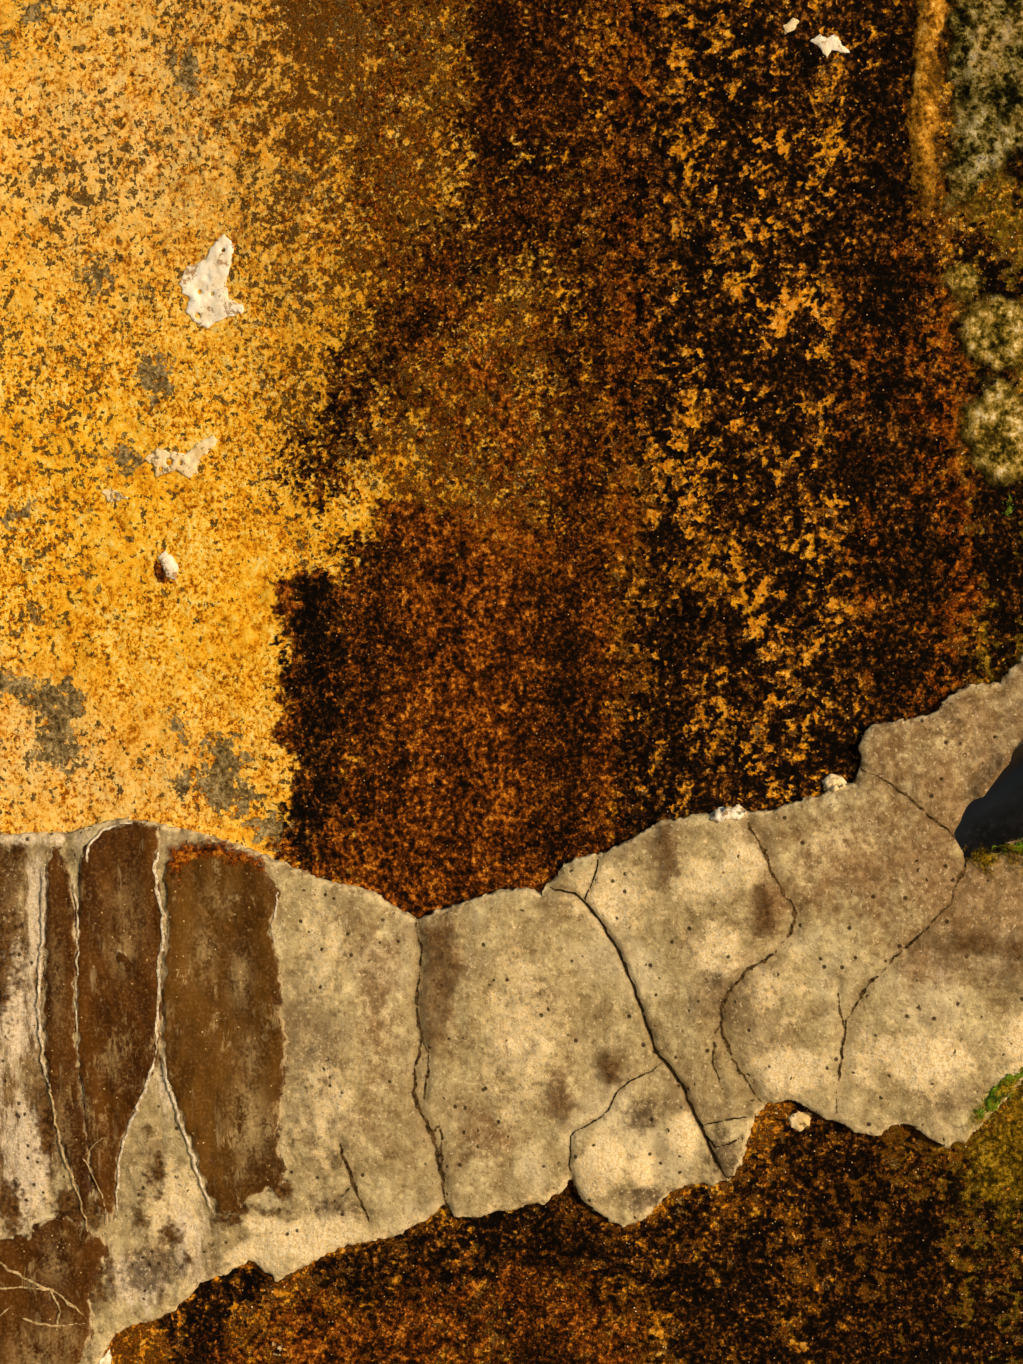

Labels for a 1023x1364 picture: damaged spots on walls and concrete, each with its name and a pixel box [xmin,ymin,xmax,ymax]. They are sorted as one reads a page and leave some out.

peeling [0,487,47,531]
peeling [131,344,181,410]
spalling [96,432,220,502]
spalling [179,234,244,329]
rust [349,0,672,913]
leakage [251,0,1023,1048]
rust [825,216,988,719]
rust [167,838,265,886]
crack [411,920,449,1208]
crack [550,822,798,1179]
crack [836,768,989,1113]
crack [0,1262,85,1330]